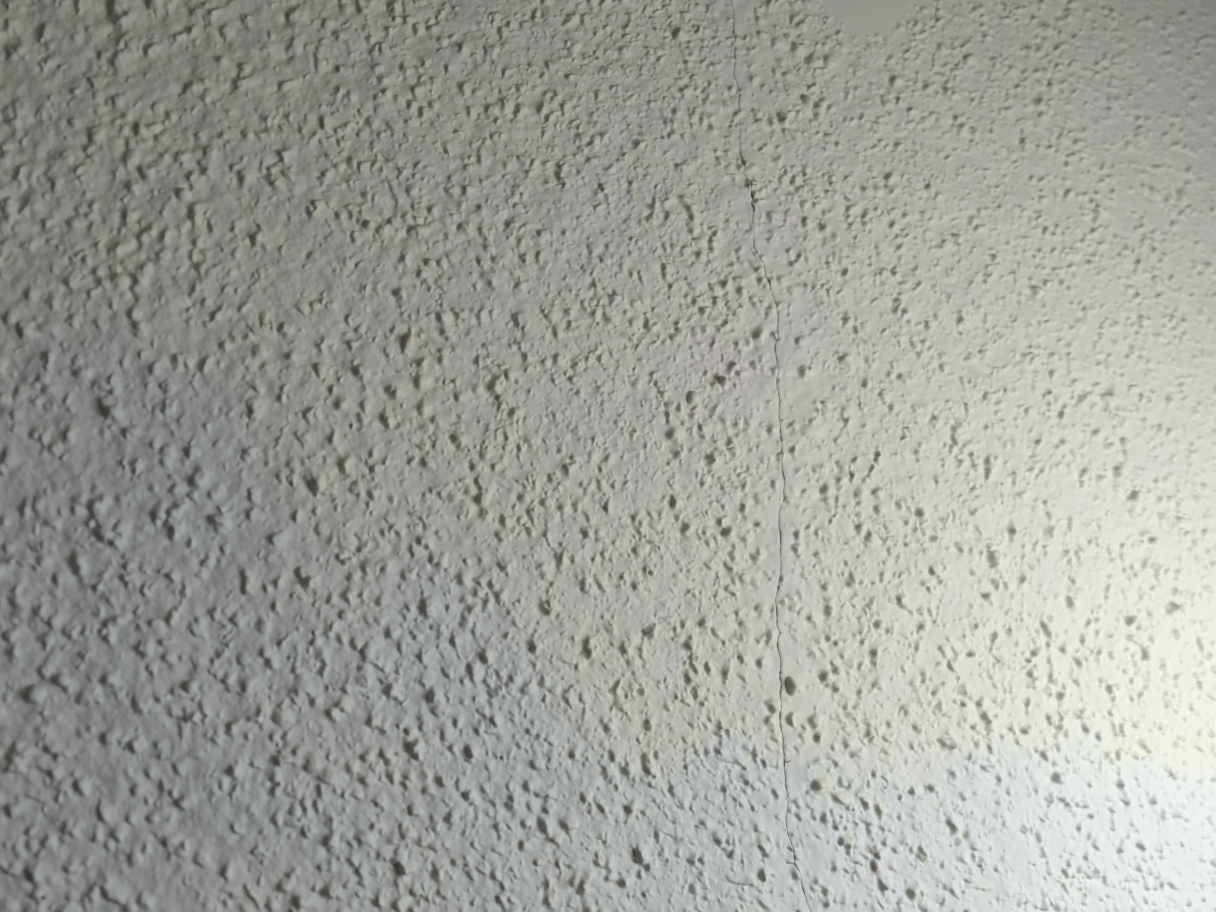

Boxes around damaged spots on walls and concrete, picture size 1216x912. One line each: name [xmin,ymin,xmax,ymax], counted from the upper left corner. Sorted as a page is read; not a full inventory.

crack [731,2,811,911]